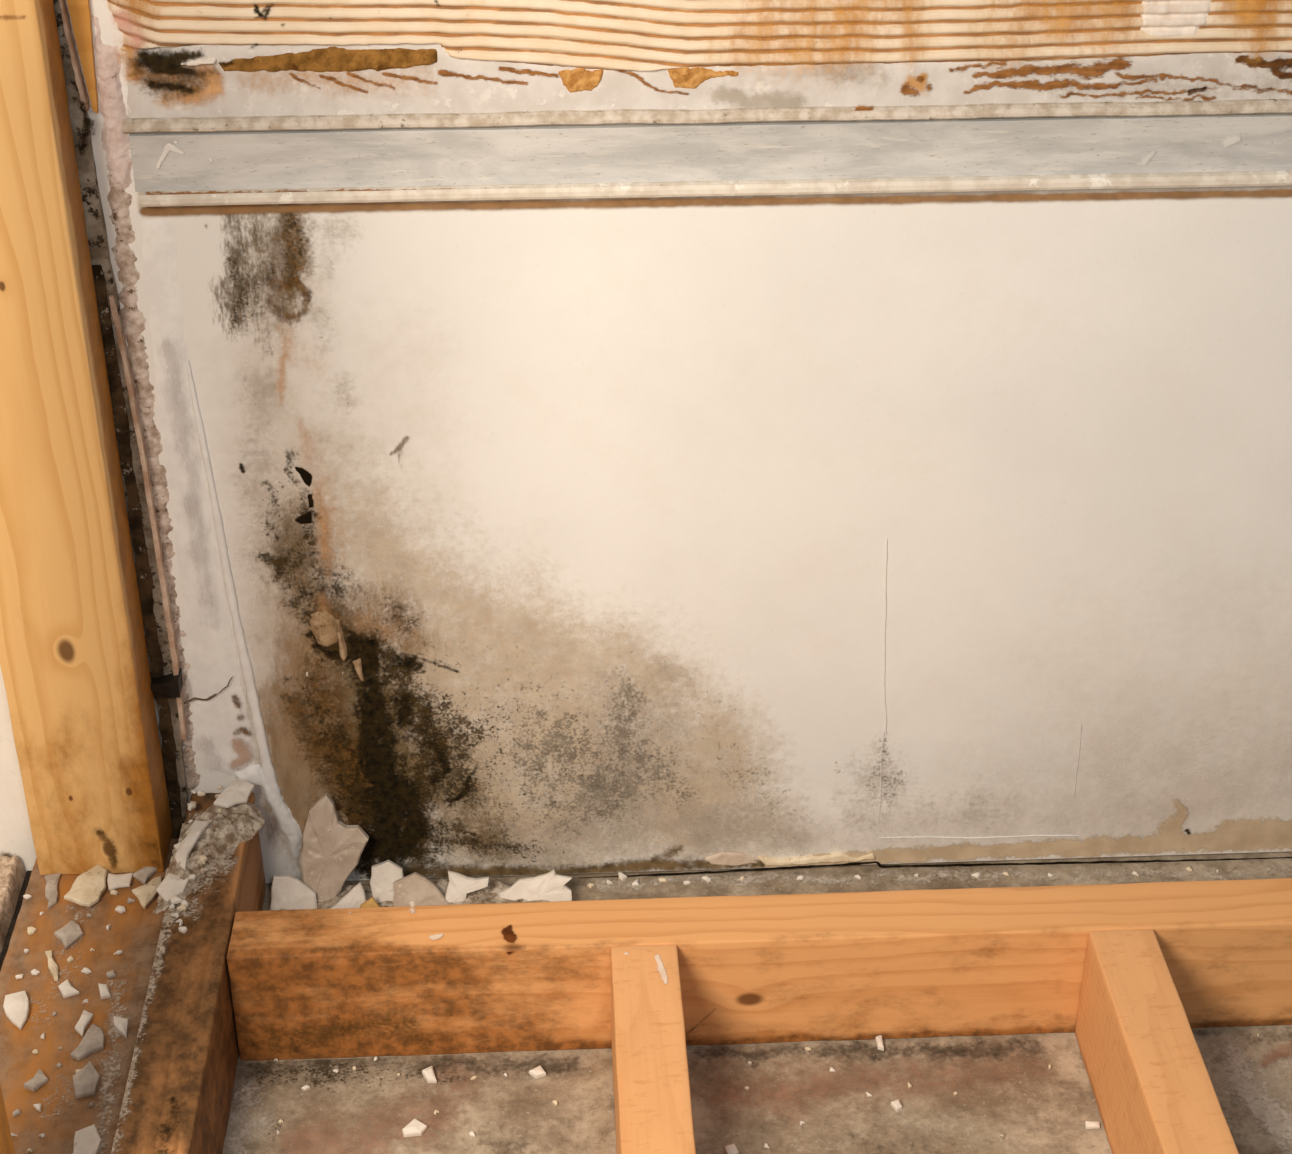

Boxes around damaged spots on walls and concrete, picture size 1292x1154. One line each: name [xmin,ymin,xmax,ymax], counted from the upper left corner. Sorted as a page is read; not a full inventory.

damp [214,204,311,329]
damp [258,444,767,879]
peeling [704,799,1292,868]